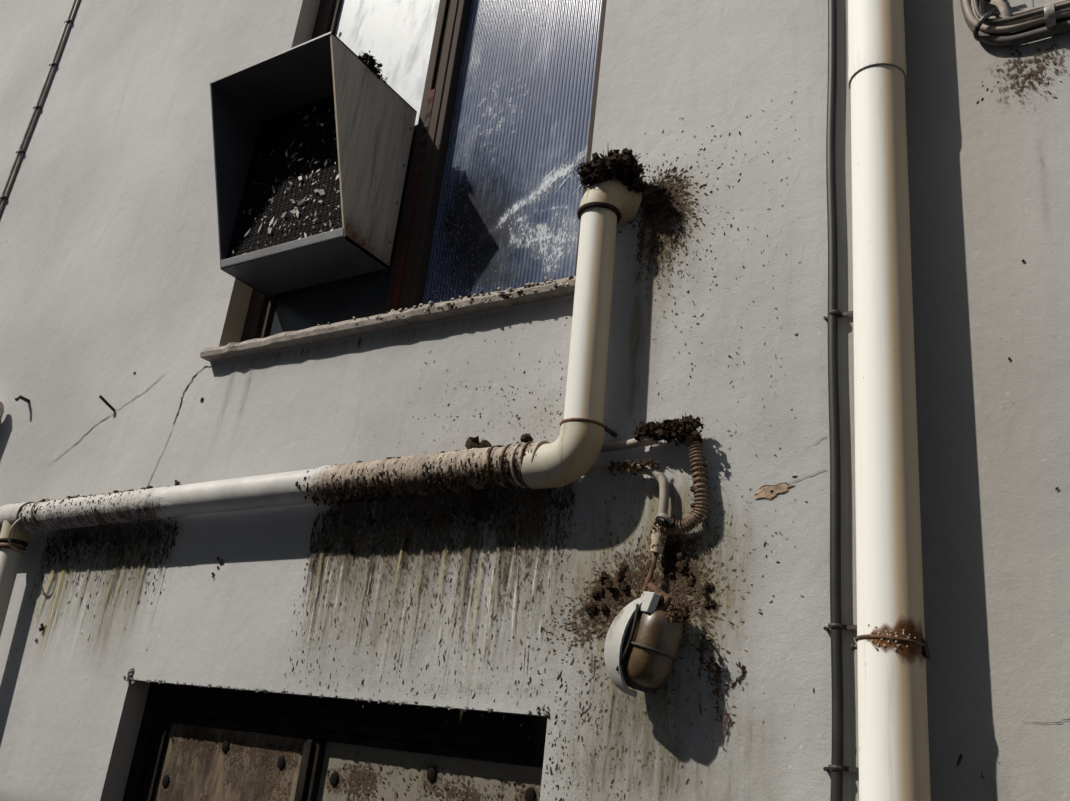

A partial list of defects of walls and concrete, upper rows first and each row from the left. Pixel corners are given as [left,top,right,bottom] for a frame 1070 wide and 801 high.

leakage [454,342,562,443]
leakage [30,517,178,643]
leakage [284,476,796,801]